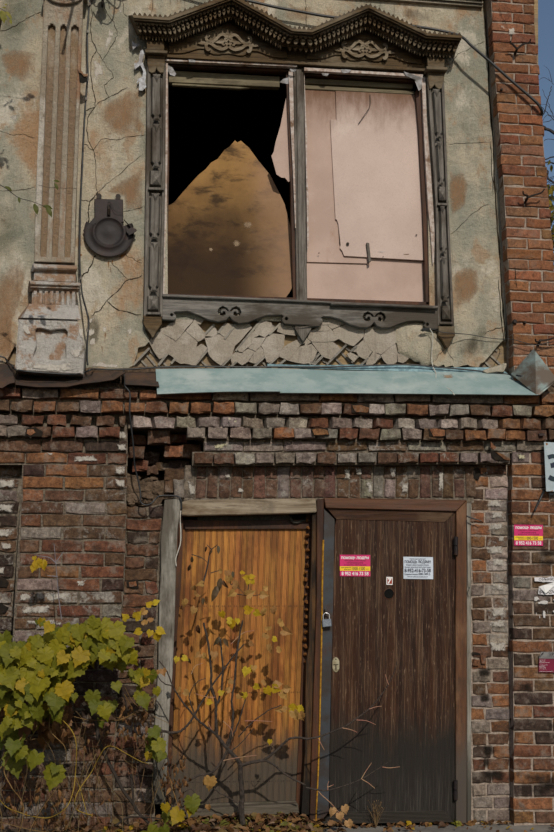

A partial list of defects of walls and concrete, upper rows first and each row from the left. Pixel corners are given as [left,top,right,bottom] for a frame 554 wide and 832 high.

crack [6,0,143,223]
peeling [32,349,81,371]
flaking render [133,317,409,367]
spalling [116,432,200,486]